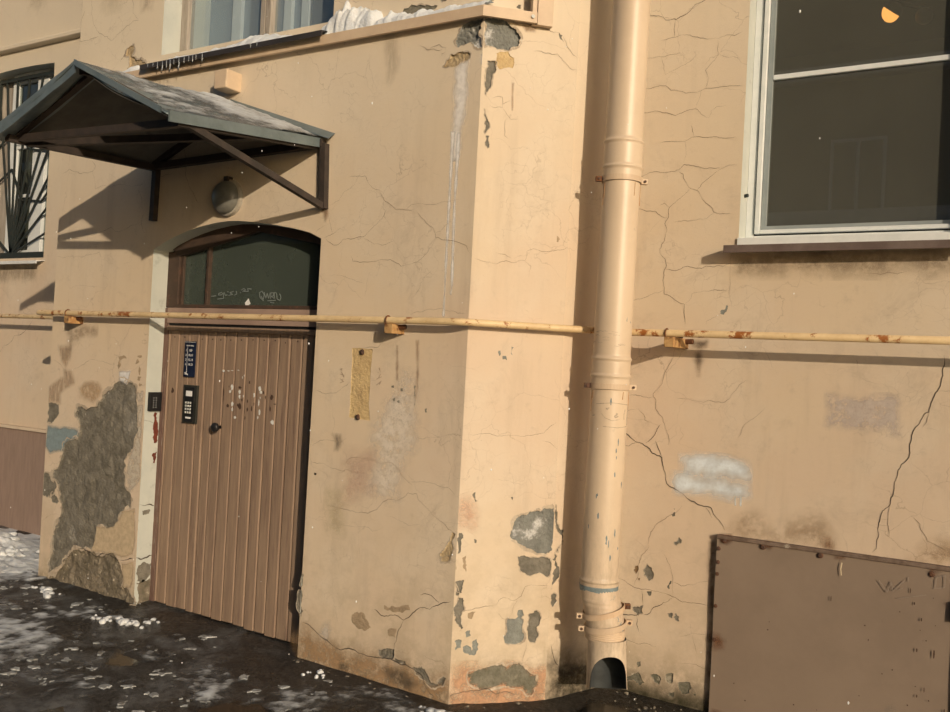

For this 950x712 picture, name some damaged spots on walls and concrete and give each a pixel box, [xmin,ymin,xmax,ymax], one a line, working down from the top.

flaking render [442,17,523,96]
crack [317,176,566,313]
water stain [443,61,468,316]
crack [635,1,741,318]
flaking render [43,355,151,606]
crack [303,585,545,698]
flaking render [439,532,478,655]
flaking render [466,661,538,697]
flaking render [504,610,542,645]
flaking render [510,504,564,607]
crack [622,350,763,669]
crack [876,358,945,549]